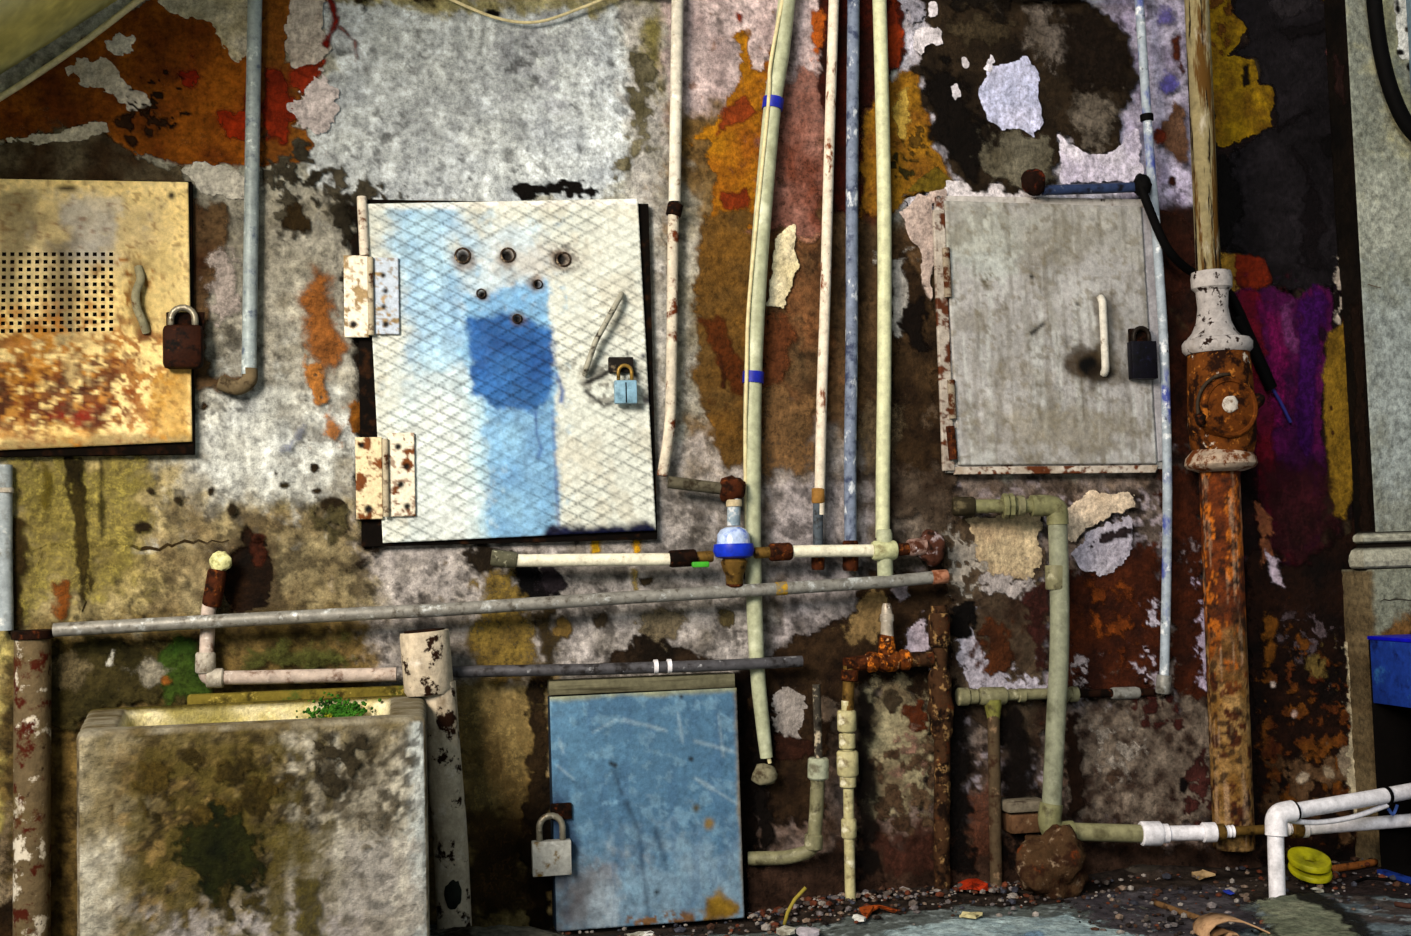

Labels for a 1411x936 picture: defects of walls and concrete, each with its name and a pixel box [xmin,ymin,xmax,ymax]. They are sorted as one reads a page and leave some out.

peeling [0,0,358,200]
spalling [315,189,357,255]
peeling [691,13,771,230]
peeling [766,224,820,308]
peeling [811,0,1059,300]
leakage [4,455,155,635]
spalling [744,460,1050,876]
corrosion [1067,465,1207,701]
leakage [0,804,13,936]
leakage [132,747,296,936]
leakage [277,877,322,936]
leakage [311,730,407,849]